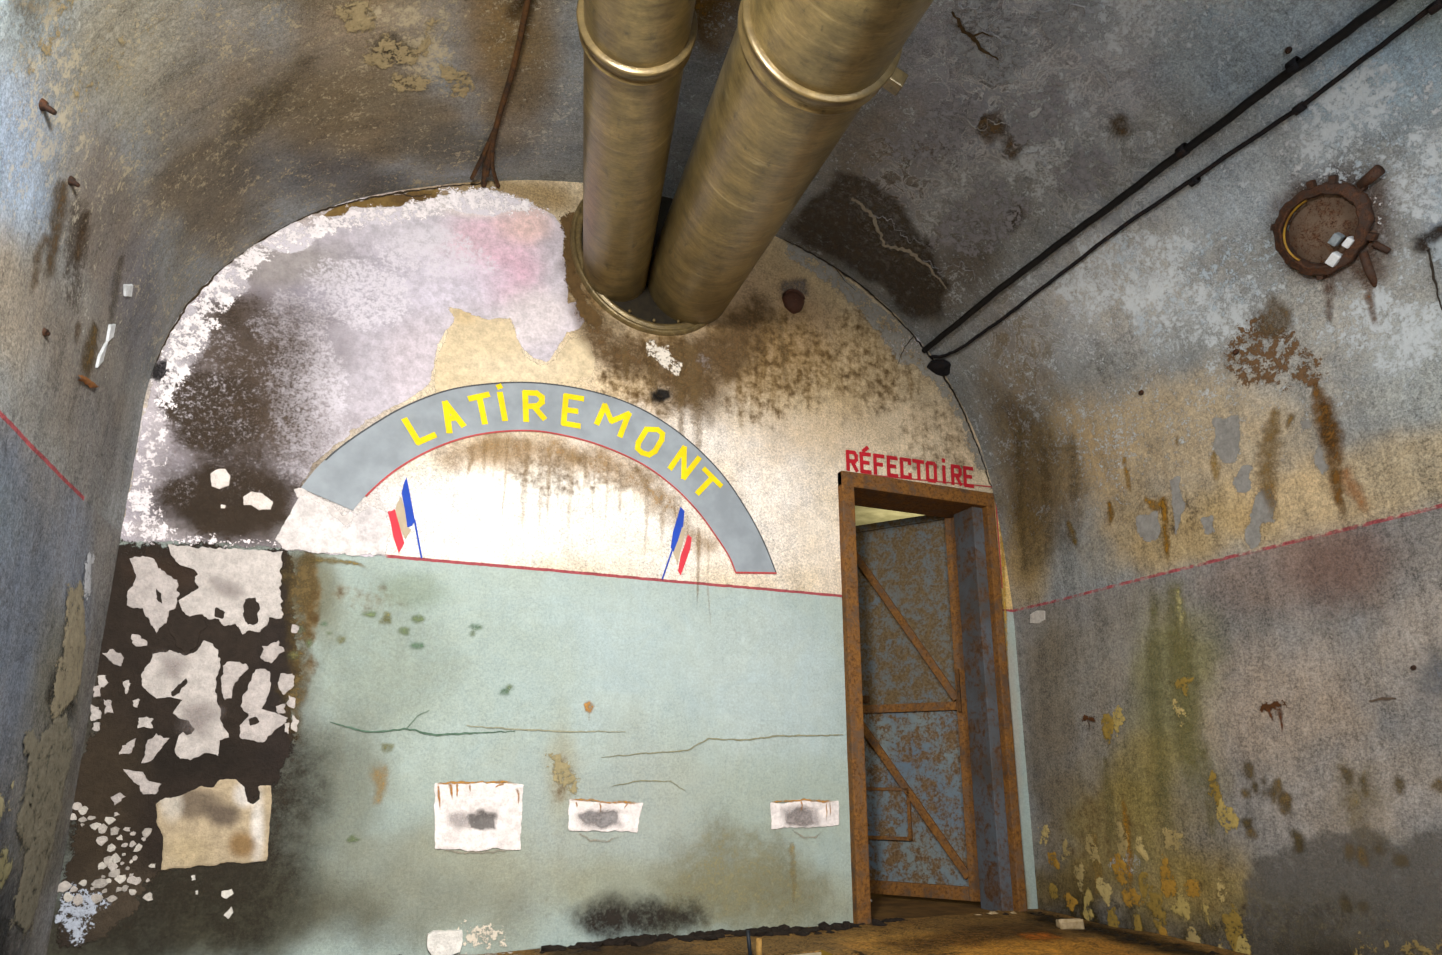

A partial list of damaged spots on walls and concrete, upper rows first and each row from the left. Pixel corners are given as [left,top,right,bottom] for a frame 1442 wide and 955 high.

leakage [33,181,89,283]
leakage [76,323,98,373]
leakage [121,186,548,720]
leakage [474,439,678,515]
crack [777,236,992,489]
rust [1223,315,1364,511]
peeling [0,188,605,948]
crack [331,710,843,790]
leakage [1101,705,1126,744]
leakage [1038,763,1442,955]
flaking render [426,930,463,955]
spalling [1349,920,1442,955]